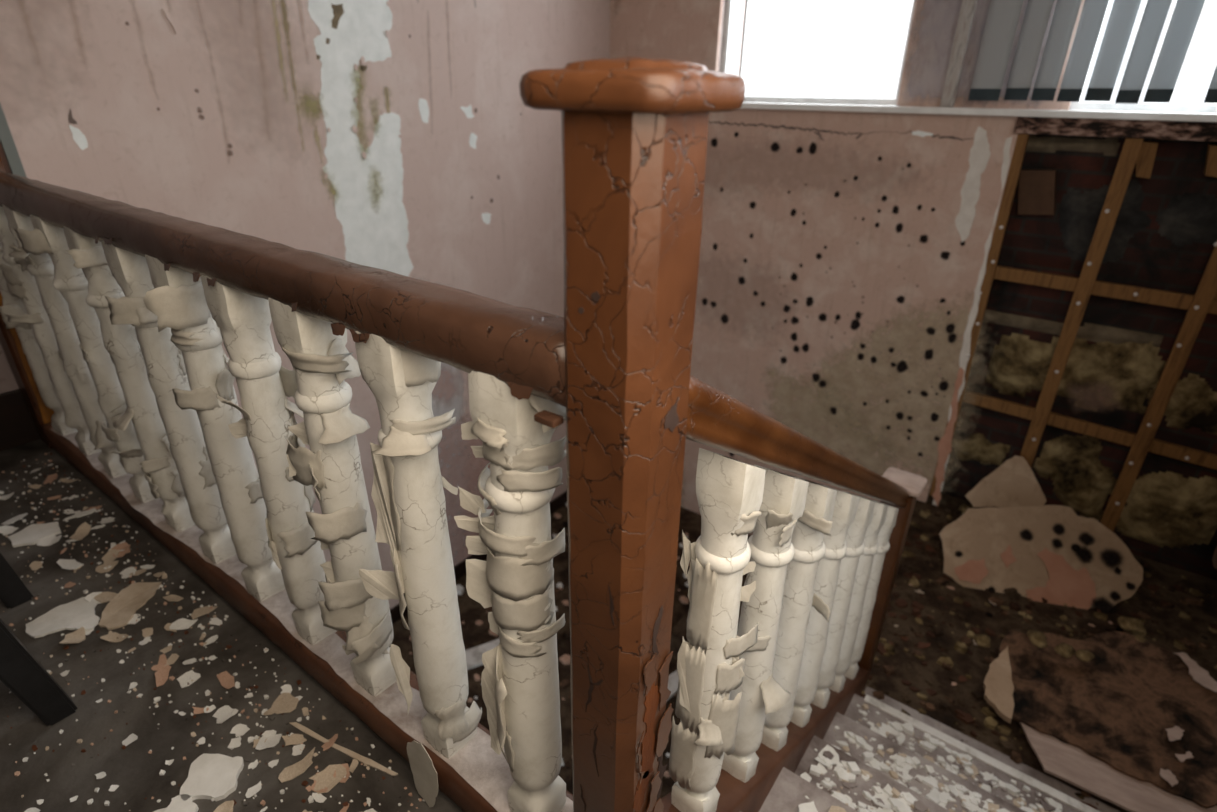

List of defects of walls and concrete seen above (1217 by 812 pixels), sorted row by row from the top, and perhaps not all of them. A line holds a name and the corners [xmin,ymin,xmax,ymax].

peeling [302,0,417,277]
leakage [855,195,903,233]
leakage [702,298,728,324]
spalling [932,126,1012,507]
leakage [768,293,980,483]
leakage [1020,529,1033,541]
leakage [1052,524,1135,614]